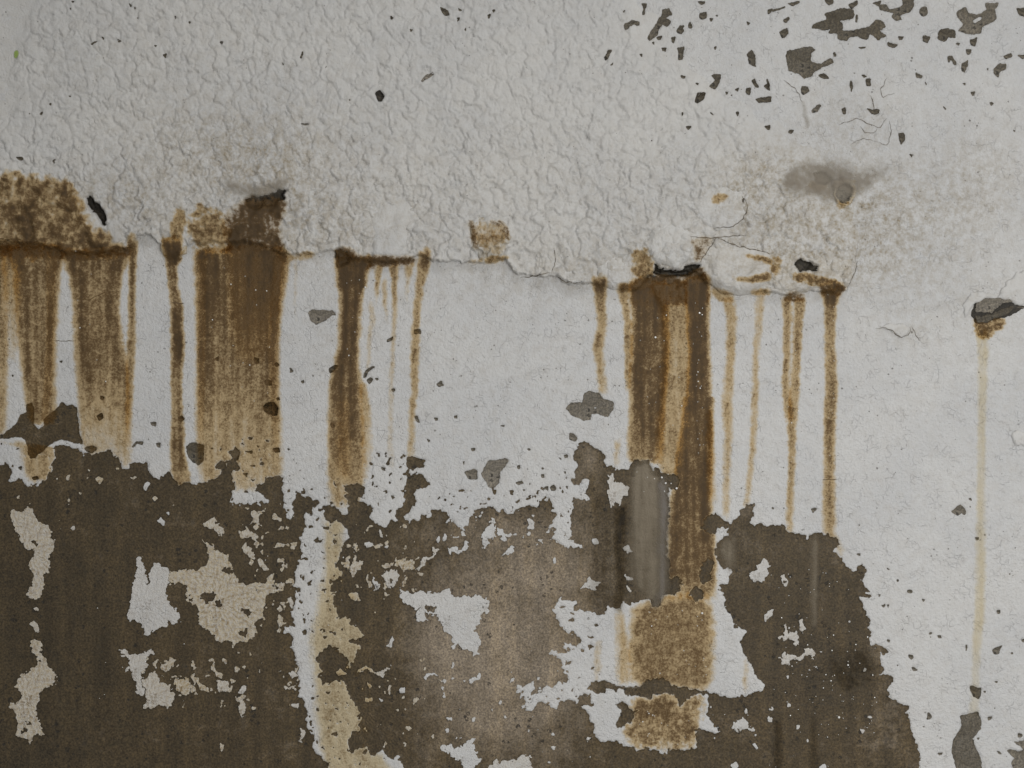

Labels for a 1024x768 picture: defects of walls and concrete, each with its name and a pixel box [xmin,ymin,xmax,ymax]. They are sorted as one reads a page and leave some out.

peeling [786,46,836,95]
crack [843,78,894,145]
peeling [812,0,928,49]
peeling [923,2,999,96]
corrosion [0,172,137,426]
corrosion [162,197,287,485]
corrosion [329,248,429,490]
crack [691,197,769,262]
peeling [0,402,932,768]
damp [618,461,669,600]
corrosion [619,240,715,686]
peeling [938,708,995,768]